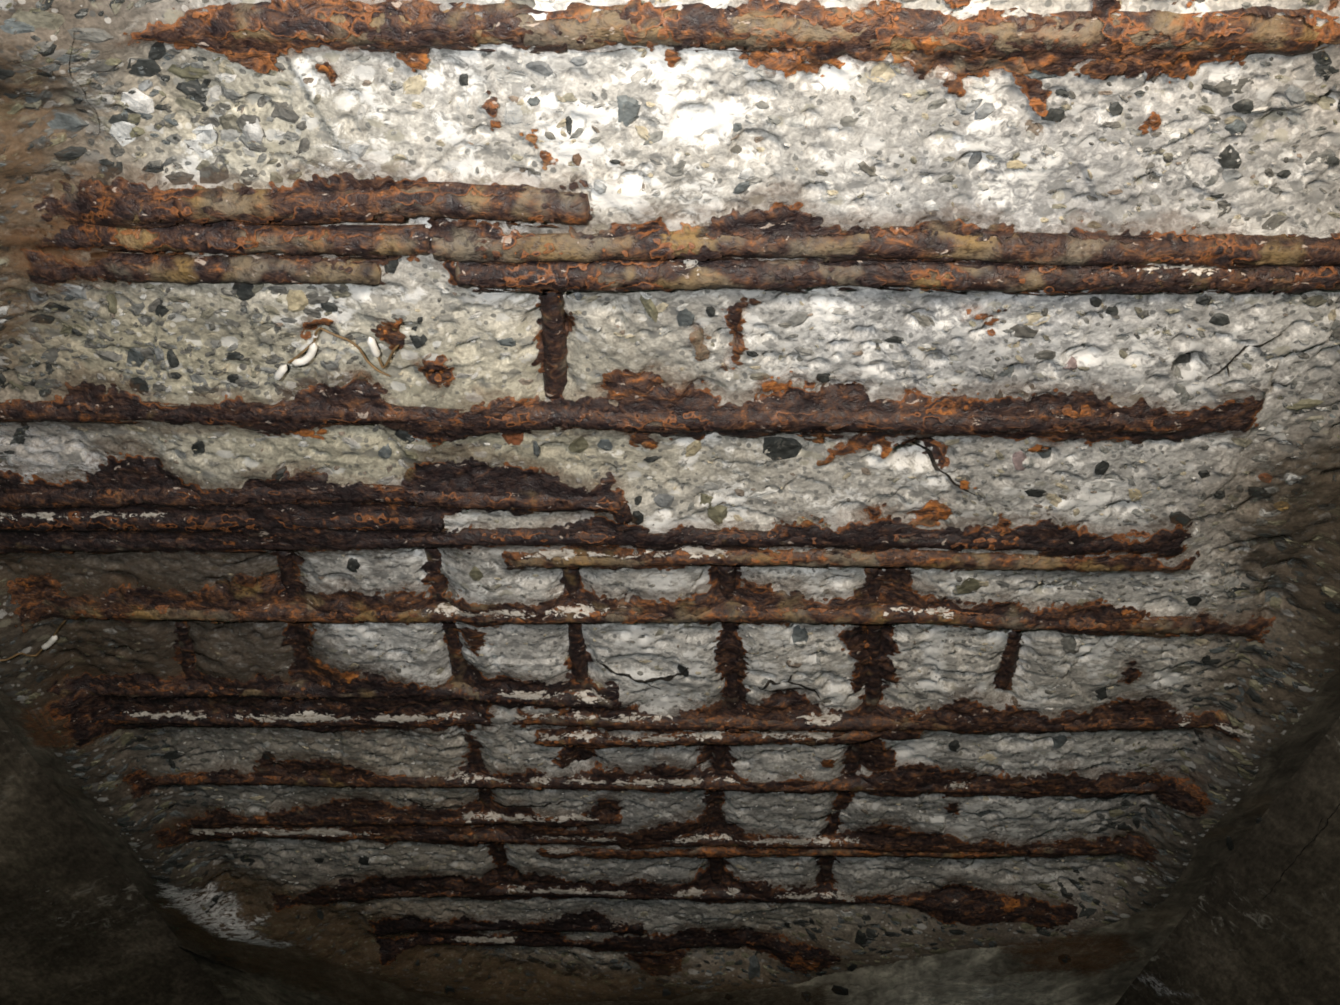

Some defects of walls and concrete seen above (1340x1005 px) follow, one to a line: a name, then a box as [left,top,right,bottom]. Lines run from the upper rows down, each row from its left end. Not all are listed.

rust [123,0,542,86]
rust [703,0,1247,117]
crack [1207,333,1282,380]
rust [796,388,988,469]
rust [0,500,495,751]
crack [596,659,688,690]
rust [834,624,902,693]
spalling [490,788,710,834]
spalling [721,790,839,839]
spalling [157,813,1159,891]
spalling [271,866,1078,929]
spalling [370,928,797,965]